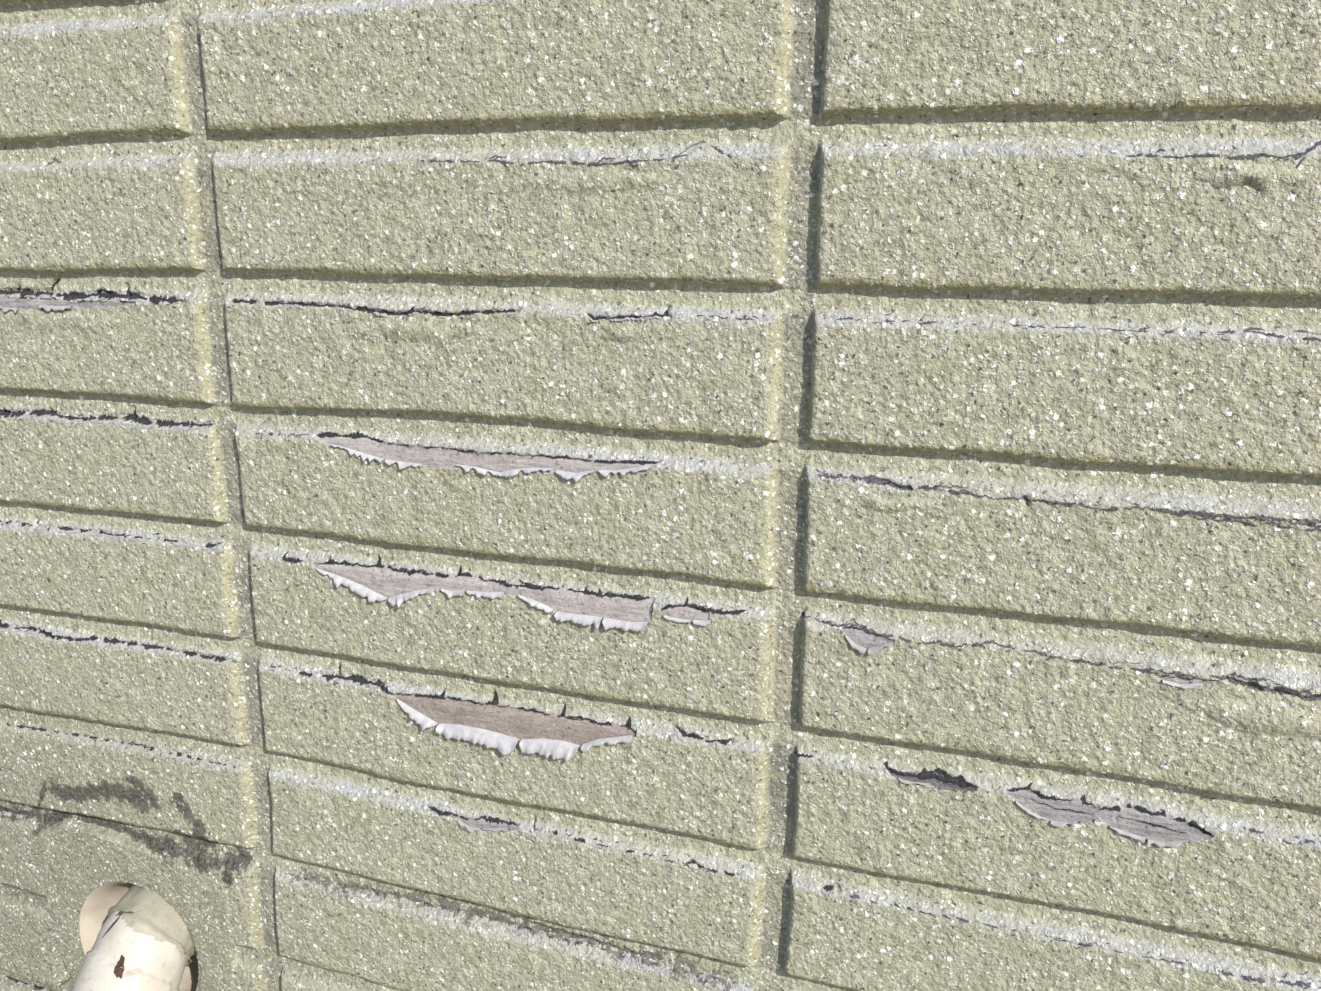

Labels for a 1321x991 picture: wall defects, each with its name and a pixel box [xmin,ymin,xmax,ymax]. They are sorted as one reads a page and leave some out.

crack [1127,140,1321,169]
peeling [0,295,135,314]
crack [231,298,520,318]
crack [0,408,213,431]
peeling [316,431,661,483]
crack [815,470,1321,532]
peeling [282,552,747,632]
crack [0,619,235,666]
crack [801,610,1321,701]
peeling [383,685,637,763]
peeling [885,761,978,794]
peeling [1005,783,1213,848]